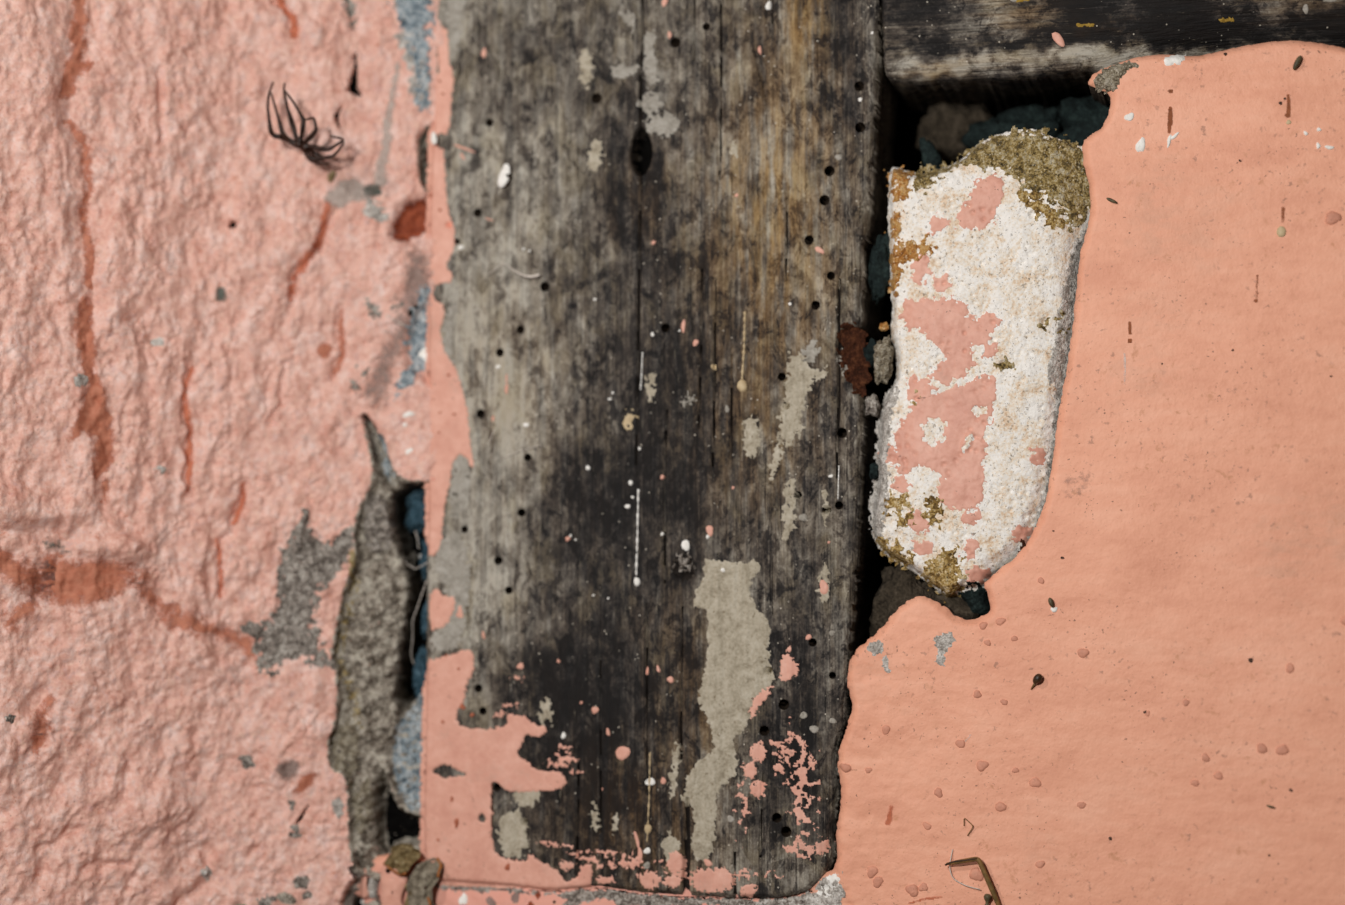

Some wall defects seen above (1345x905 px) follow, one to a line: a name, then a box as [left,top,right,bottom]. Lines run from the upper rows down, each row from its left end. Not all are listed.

spalling [237,0,846,905]
flaking render [868,125,1091,617]